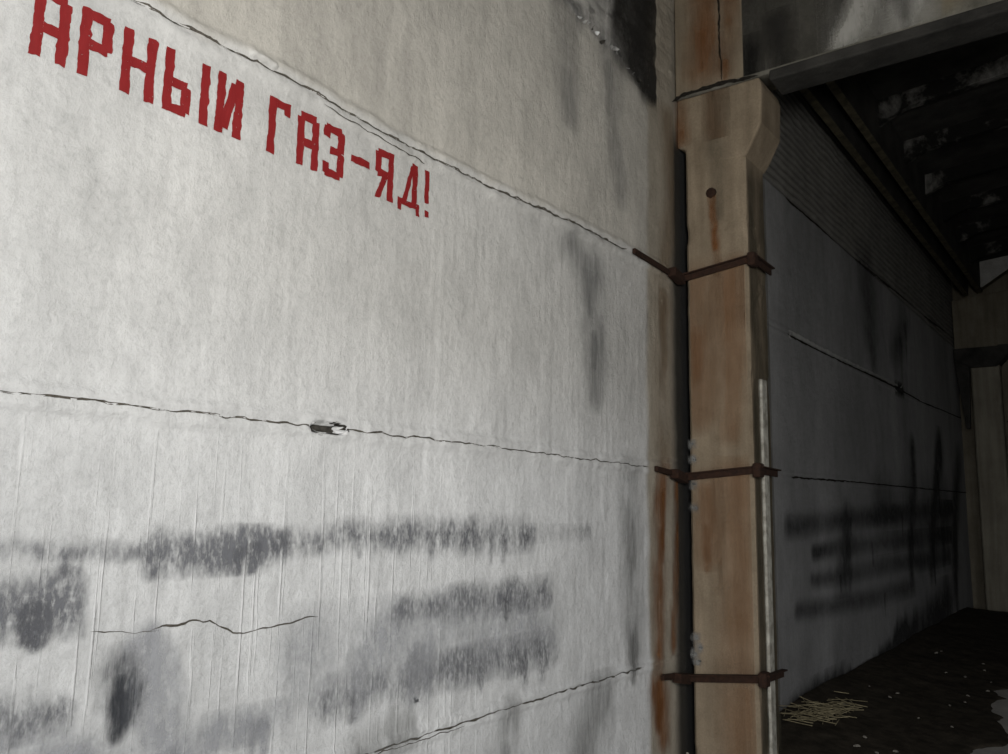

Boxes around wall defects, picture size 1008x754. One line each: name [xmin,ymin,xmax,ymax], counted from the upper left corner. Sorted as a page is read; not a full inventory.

spalling [578,16,620,55]
crack [134,0,626,249]
crack [0,390,309,426]
crack [340,429,647,467]
leakage [129,526,288,577]
leakage [370,521,492,552]
corrosion [656,473,678,537]
leakage [0,555,82,649]
crack [92,616,318,634]
leakage [111,626,191,754]
crack [366,667,642,754]
corrosion [652,676,667,746]